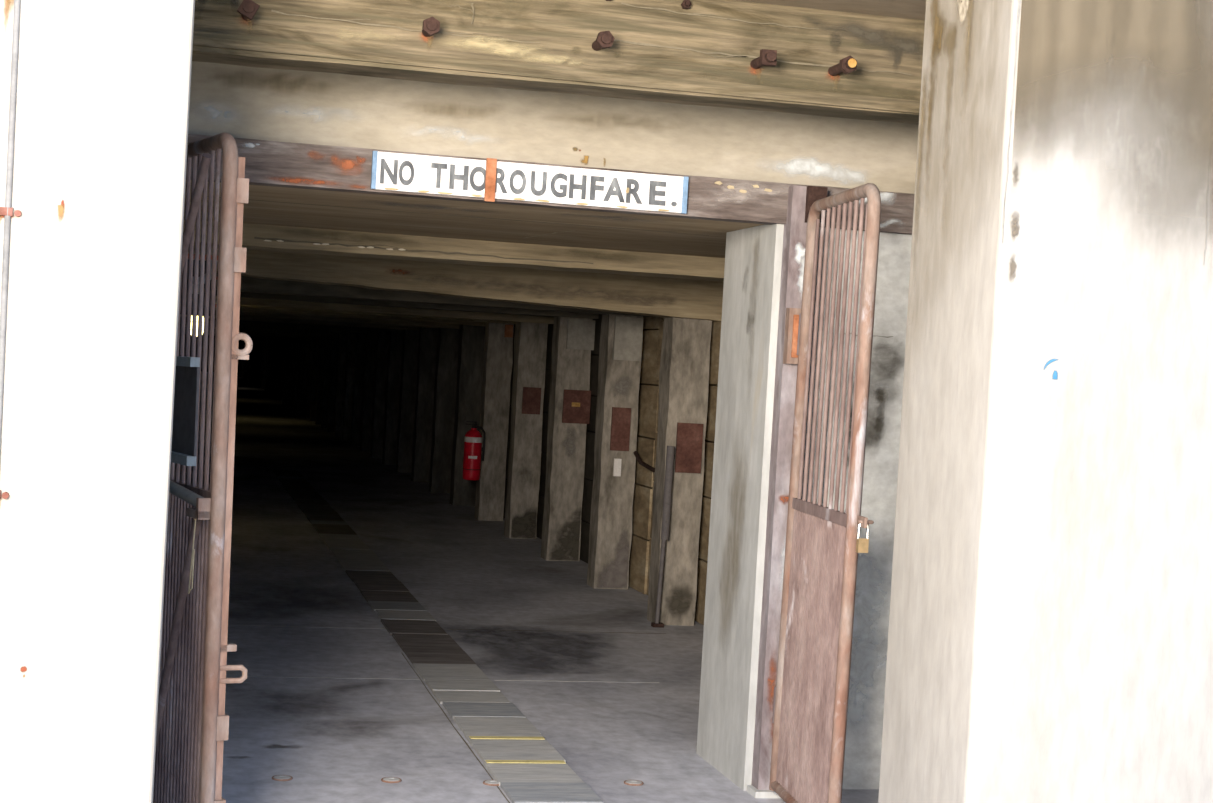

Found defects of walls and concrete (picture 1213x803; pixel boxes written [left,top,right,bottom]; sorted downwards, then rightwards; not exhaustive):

leakage [1015,0,1213,152]
corrosion [332,157,365,170]
leakage [866,390,884,444]
leakage [459,627,599,673]
leakage [849,558,877,713]